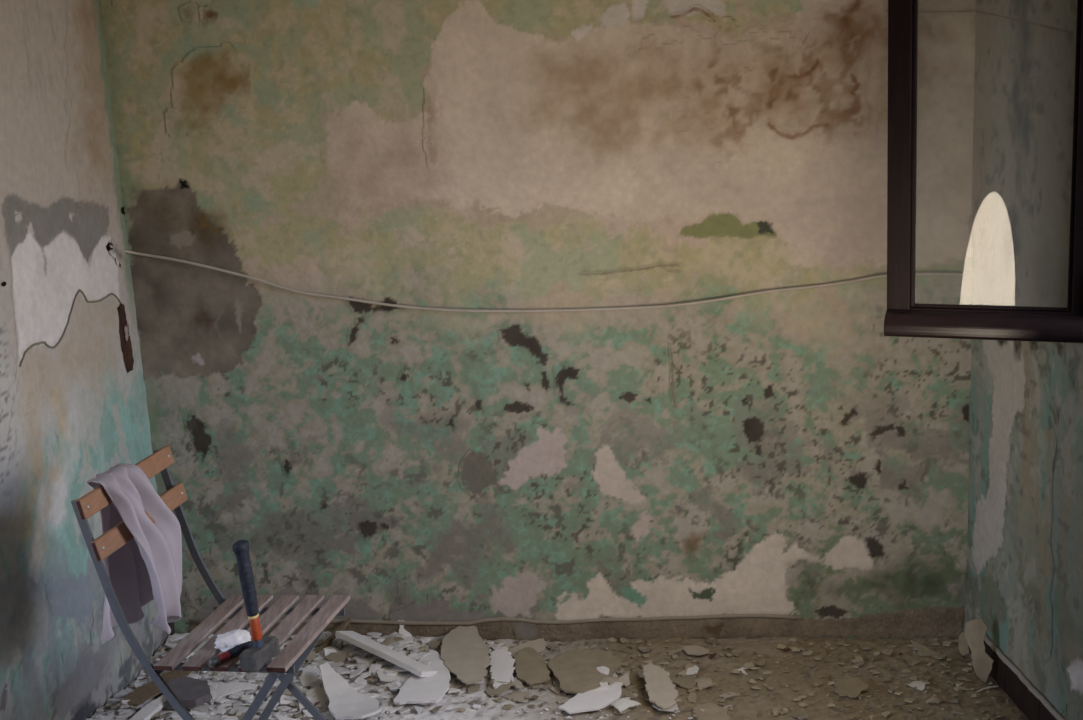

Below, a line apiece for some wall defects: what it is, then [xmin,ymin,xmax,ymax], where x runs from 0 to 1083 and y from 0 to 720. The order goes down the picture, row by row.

peeling [316,0,888,279]
corrosion [625,0,888,170]
peeling [916,0,976,271]
water stain [0,283,169,720]
corrosion [117,303,134,373]
spalling [0,174,265,380]
spalling [344,296,408,351]
peeling [457,323,581,498]
peeling [590,441,657,542]
peeling [970,340,1027,593]
water stain [994,340,1065,428]
spalling [324,531,994,714]